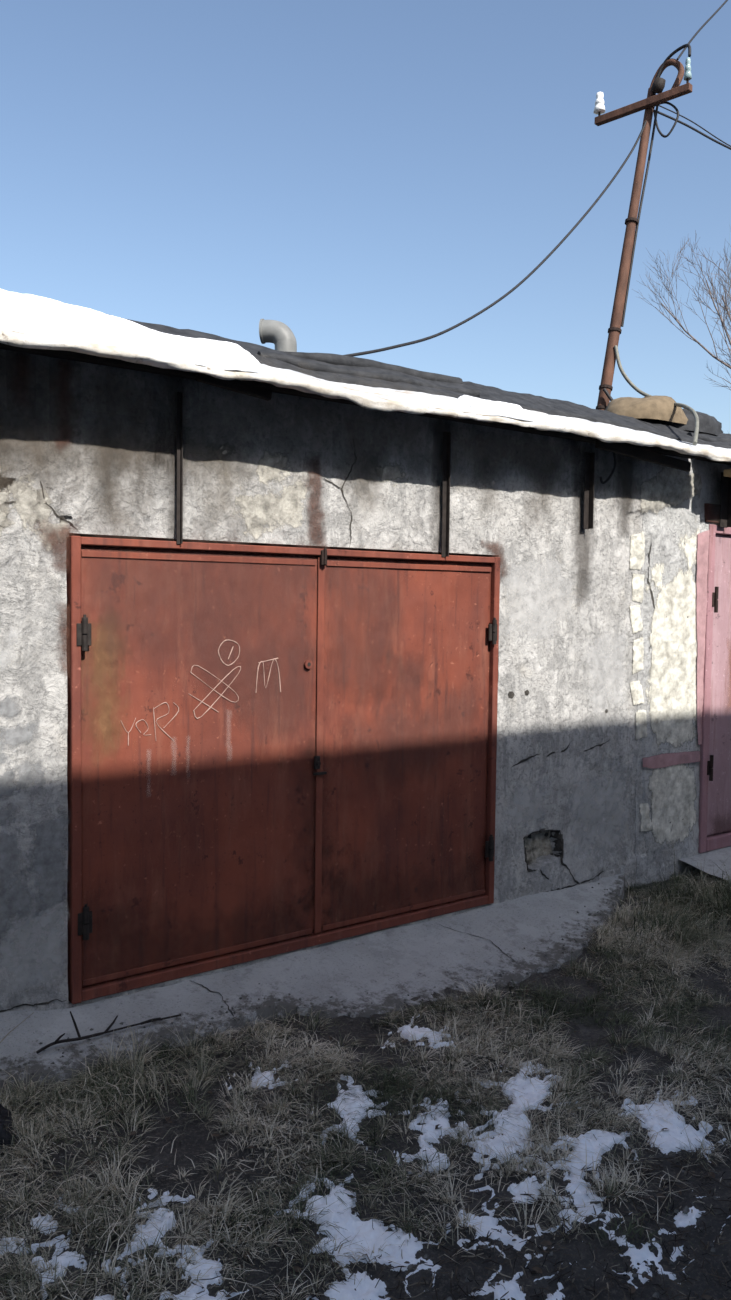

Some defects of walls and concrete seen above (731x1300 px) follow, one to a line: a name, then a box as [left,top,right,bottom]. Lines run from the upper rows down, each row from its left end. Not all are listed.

crack [1,481,79,532]
corrosion [489,544,504,575]
peeling [629,529,700,747]
crack [512,740,609,767]
peeling [639,764,697,847]